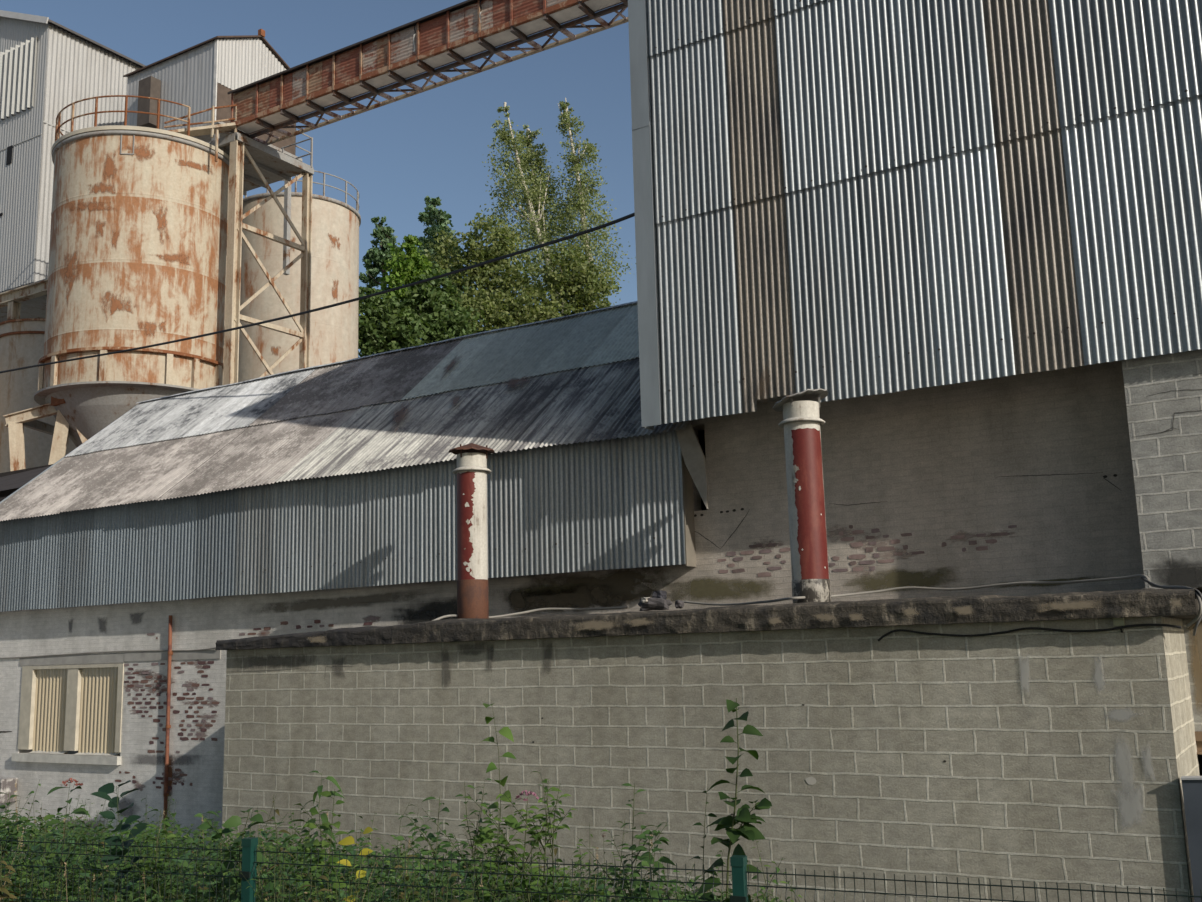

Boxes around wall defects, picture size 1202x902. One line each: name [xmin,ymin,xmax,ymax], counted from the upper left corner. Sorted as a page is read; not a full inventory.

rust [179,160,212,172]
rust [71,146,154,247]
rust [153,209,189,265]
rust [64,252,79,304]
rust [102,292,166,336]
crack [1135,373,1202,437]
peeling [457,471,476,580]
peeling [717,428,924,580]
peeling [941,525,1017,552]
leakage [1157,560,1202,602]
peeling [124,660,220,753]
peeling [115,768,193,790]